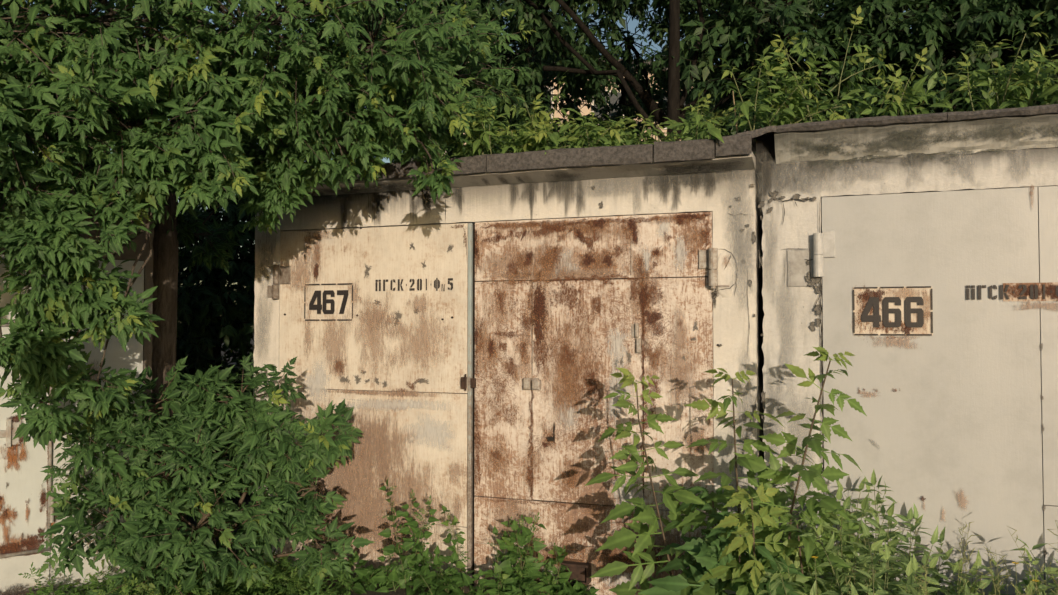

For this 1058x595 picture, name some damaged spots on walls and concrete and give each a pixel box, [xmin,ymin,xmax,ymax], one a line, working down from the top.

leakage [374,185,396,221]
leakage [411,185,434,214]
leakage [483,178,583,218]
rust [292,232,328,288]
rust [1008,285,1058,310]
rust [323,322,346,375]
rust [337,284,435,396]
rust [452,213,710,537]
rust [1,415,27,470]
rust [308,416,440,547]
rust [0,480,57,557]
rust [540,508,680,574]